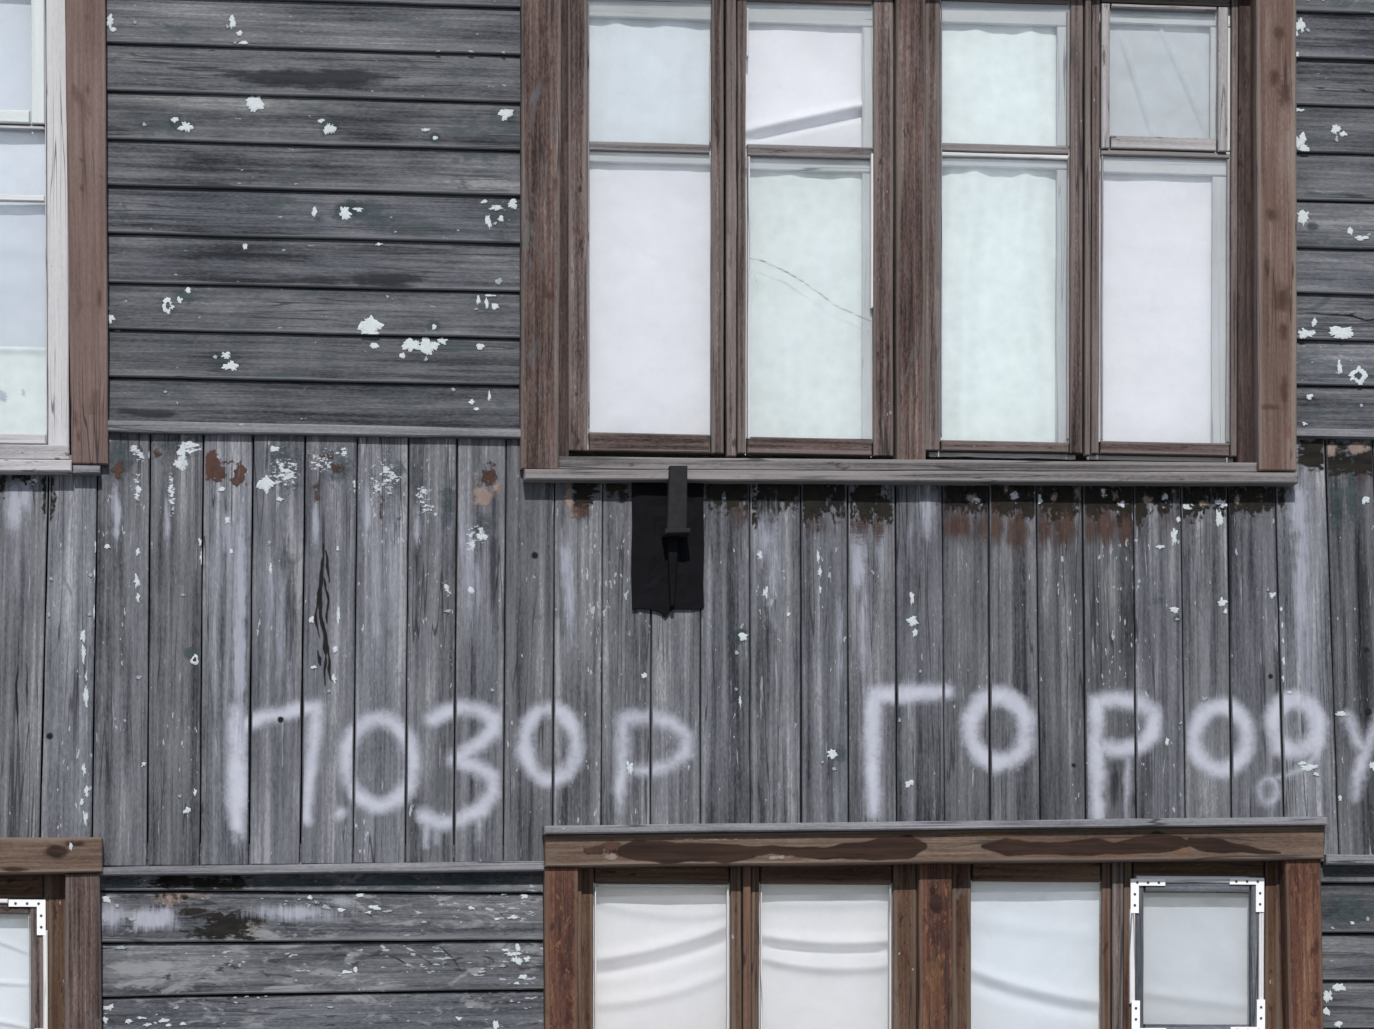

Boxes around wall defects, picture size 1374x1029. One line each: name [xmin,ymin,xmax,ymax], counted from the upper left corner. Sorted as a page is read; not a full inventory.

peeling [357,315,384,349]
peeling [399,321,448,362]
leakage [6,481,31,529]
peeling [88,440,201,582]
peeling [256,446,452,546]
leakage [922,485,931,538]
peeling [466,518,490,559]
crack [314,543,331,684]
peeling [356,893,394,914]
peeling [498,944,531,985]
peeling [125,1006,186,1027]
peeling [1323,983,1346,1028]